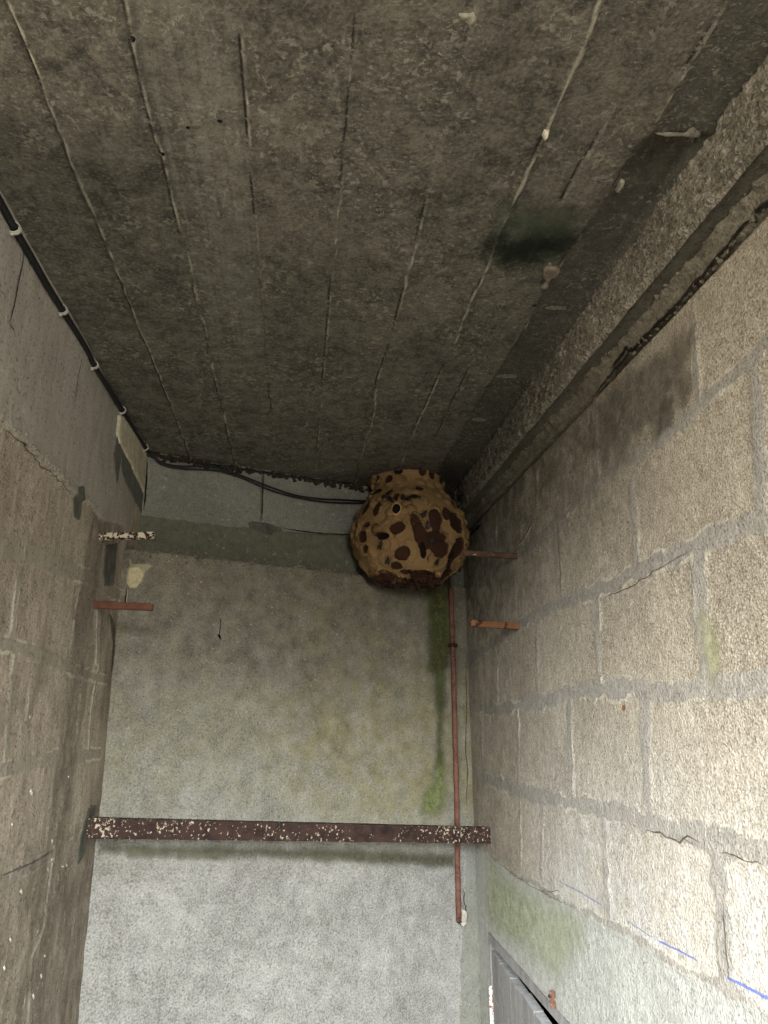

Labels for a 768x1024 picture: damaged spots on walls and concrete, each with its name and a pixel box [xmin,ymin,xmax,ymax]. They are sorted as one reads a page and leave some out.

leakage [485,214,577,270]
crack [8,254,24,331]
leakage [603,335,690,458]
crack [1,414,74,494]
crack [601,553,694,601]
leakage [423,666,446,813]
crack [646,830,763,865]